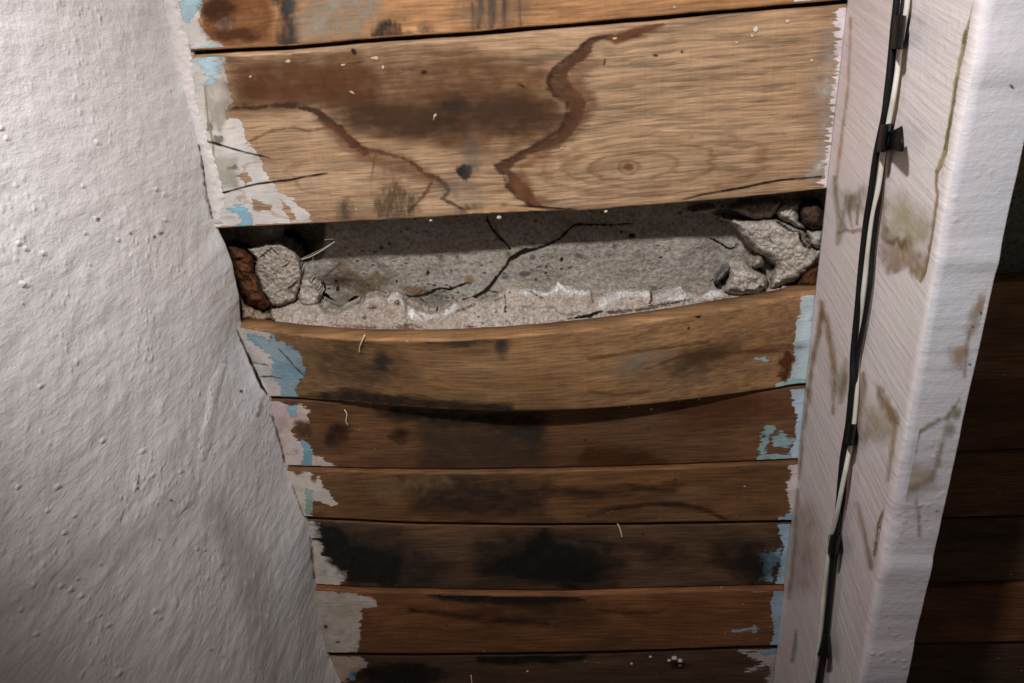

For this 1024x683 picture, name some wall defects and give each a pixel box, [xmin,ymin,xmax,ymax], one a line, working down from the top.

water stain [372,20,401,36]
peeling [176,0,313,227]
water stain [232,23,663,217]
crack [198,141,326,218]
crack [325,205,634,328]
water stain [806,304,844,398]
water stain [313,389,542,463]
spalling [241,248,815,683]
water stain [858,389,896,435]
water stain [918,405,961,437]
water stain [316,522,431,586]
water stain [433,527,623,612]